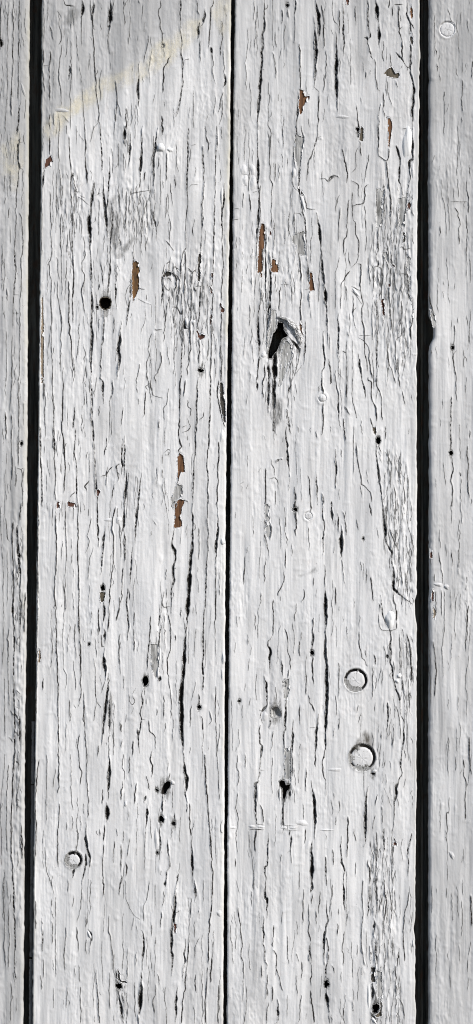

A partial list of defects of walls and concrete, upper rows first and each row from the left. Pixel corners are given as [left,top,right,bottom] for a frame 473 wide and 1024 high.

peeling [297,89,310,115]
peeling [383,66,400,79]
crack [429,2,473,317]
peeling [131,259,141,303]
peeling [257,223,279,279]
peeling [267,308,294,387]
crack [0,0,232,1024]
peeling [170,452,186,529]
crack [230,0,415,1024]
crack [429,317,472,819]
crack [435,812,472,987]